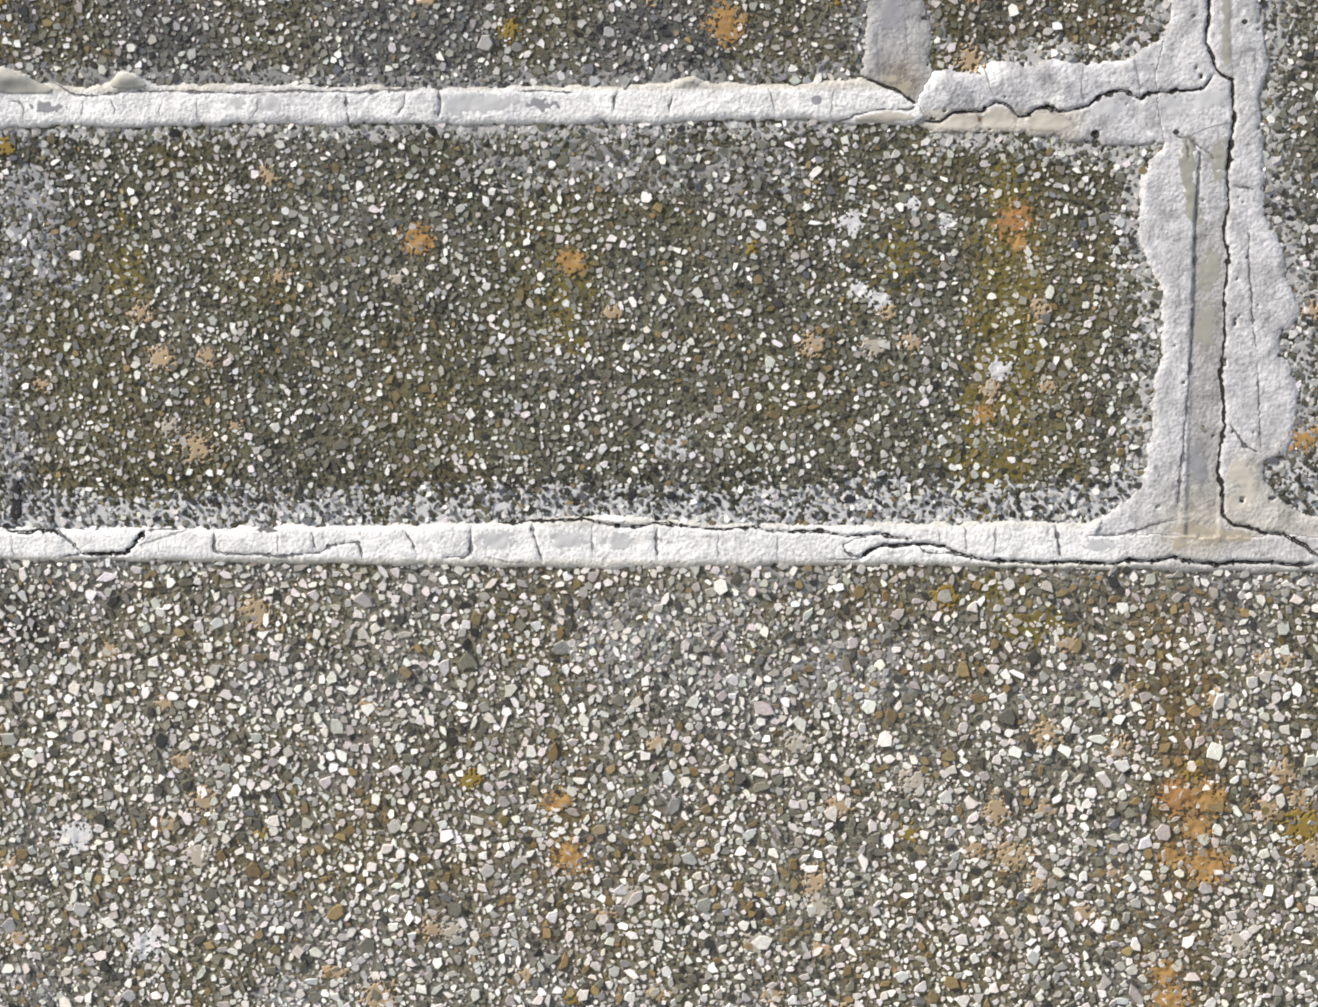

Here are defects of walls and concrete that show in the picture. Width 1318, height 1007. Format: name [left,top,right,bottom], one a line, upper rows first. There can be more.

crack [7,525,363,559]
crack [405,0,1318,569]